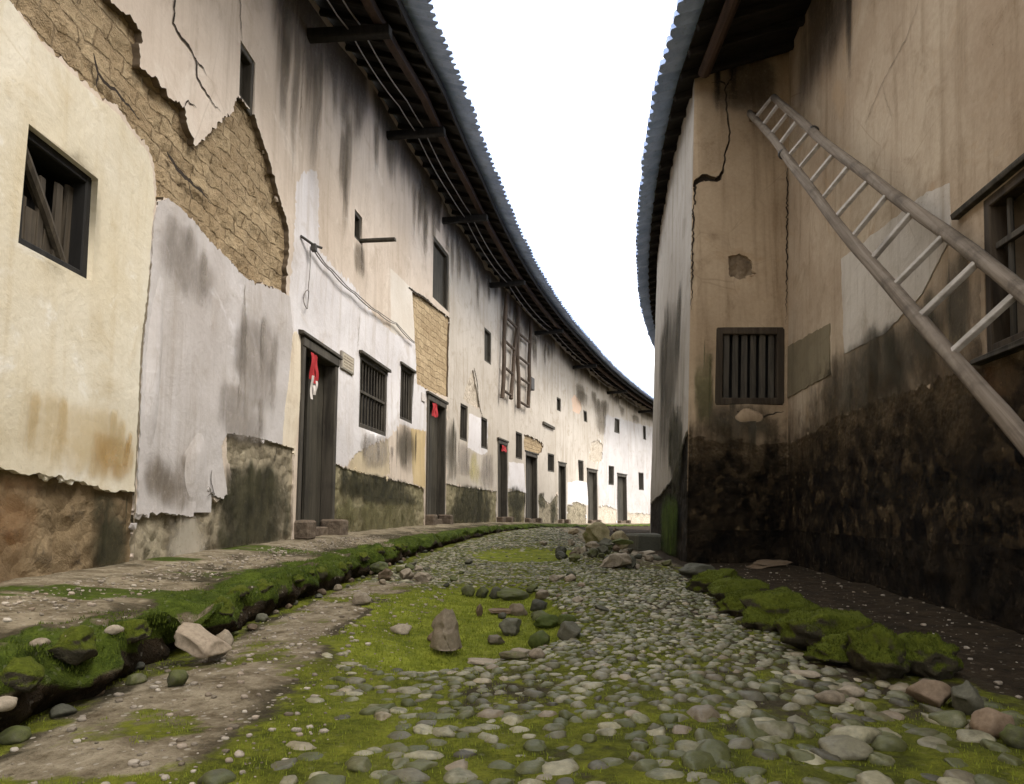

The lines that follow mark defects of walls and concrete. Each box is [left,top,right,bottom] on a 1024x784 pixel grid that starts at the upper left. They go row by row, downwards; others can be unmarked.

crack [173,0,218,108]
flaking render [10,0,284,291]
crack [690,81,729,310]
crack [783,168,791,322]
flaking render [412,293,449,396]
damp [924,256,1024,422]
flaking render [0,470,236,582]
flaking render [226,434,292,544]
damp [337,426,417,519]
damp [448,457,491,523]
damp [509,488,557,523]
damp [659,292,1024,635]